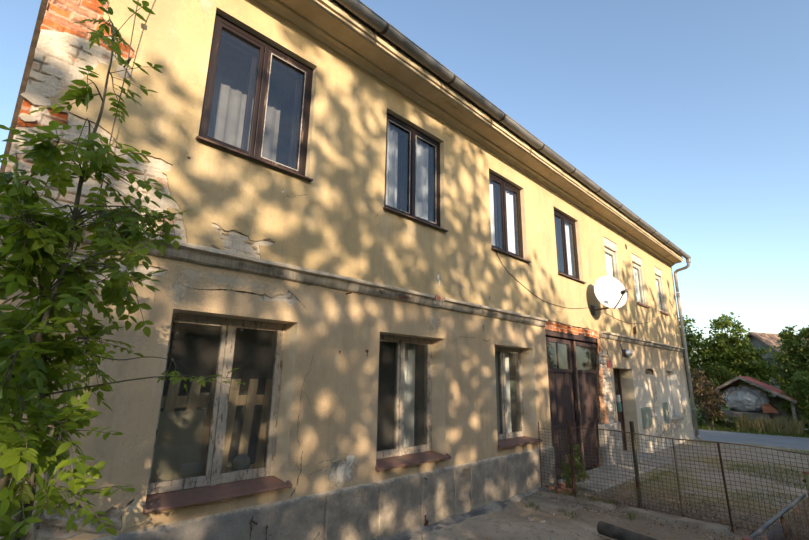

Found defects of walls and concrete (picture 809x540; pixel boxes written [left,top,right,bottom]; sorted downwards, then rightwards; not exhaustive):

peeling [0,0,187,243]
peeling [208,223,273,258]
flaking render [545,321,616,424]
peeling [26,499,133,540]